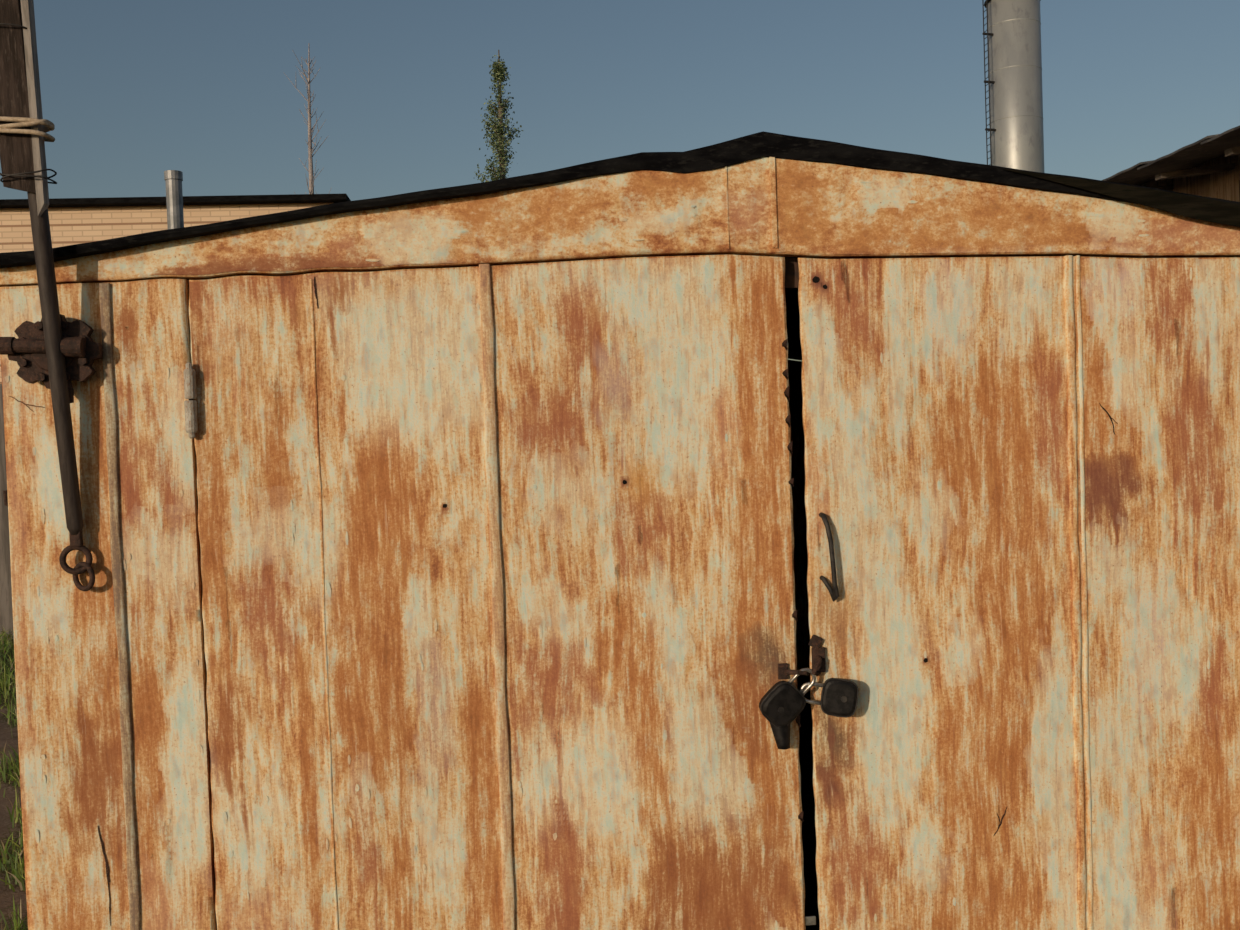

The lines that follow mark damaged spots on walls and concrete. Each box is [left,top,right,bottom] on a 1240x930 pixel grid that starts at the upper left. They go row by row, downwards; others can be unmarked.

crack [98,825,111,926]
rust [6,227,503,930]
rust [437,157,1240,930]